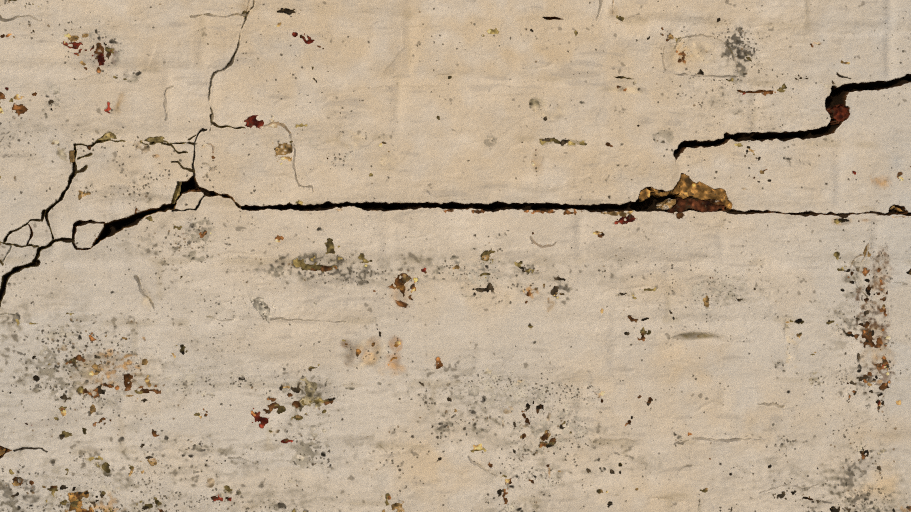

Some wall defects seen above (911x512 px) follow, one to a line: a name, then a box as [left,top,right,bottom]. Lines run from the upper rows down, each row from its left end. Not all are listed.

peeling [63,17,131,74]
crack [662,28,787,96]
crack [673,73,911,160]
crack [0,0,636,316]
spalling [630,173,733,219]
crack [725,209,911,219]
crack [207,297,346,323]
peeling [826,238,911,413]
peeling [77,332,173,400]
peeling [251,364,336,443]
crack [0,446,48,459]
peeling [9,440,175,512]